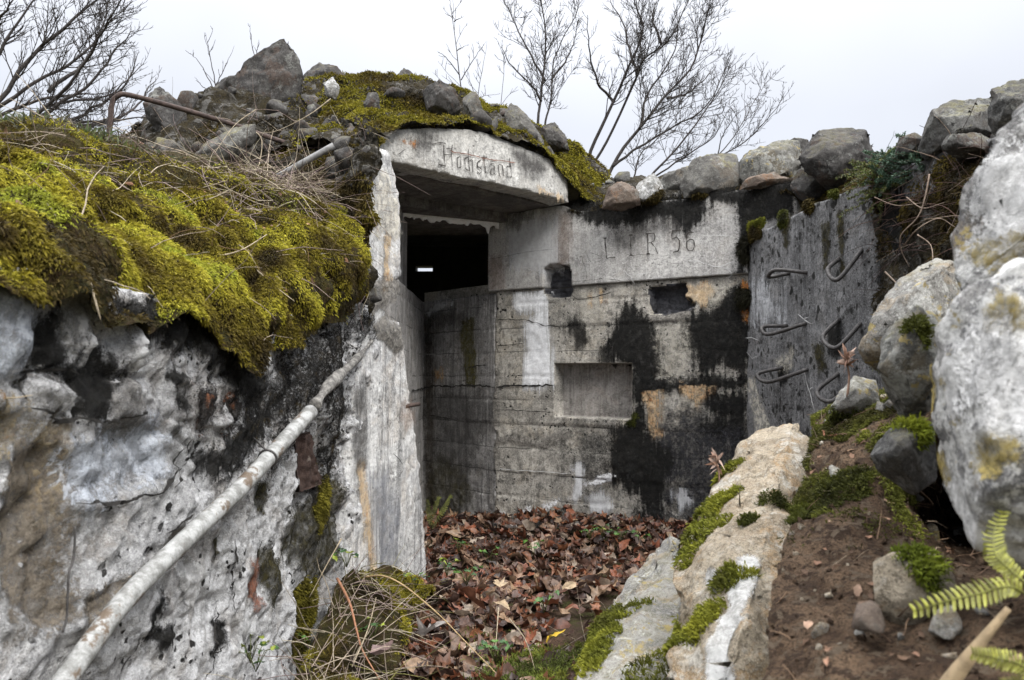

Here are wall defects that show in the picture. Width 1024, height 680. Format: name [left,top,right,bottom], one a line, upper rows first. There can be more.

crack [392,234,735,413]